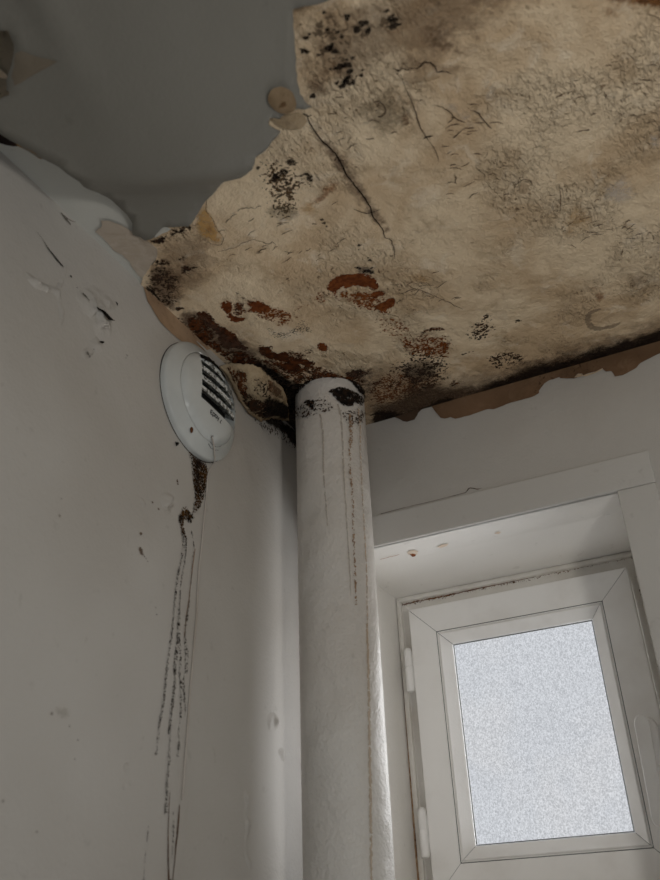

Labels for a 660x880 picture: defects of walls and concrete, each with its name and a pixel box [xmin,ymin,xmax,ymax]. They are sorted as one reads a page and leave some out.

leakage [299,9,402,89]
leakage [146,256,197,309]
leakage [151,210,219,244]
leakage [256,159,313,217]
rust [176,273,458,406]
flaking render [0,0,660,425]
crack [303,114,395,256]
leakage [467,315,496,340]
leakage [230,331,660,606]
leakage [155,452,208,880]